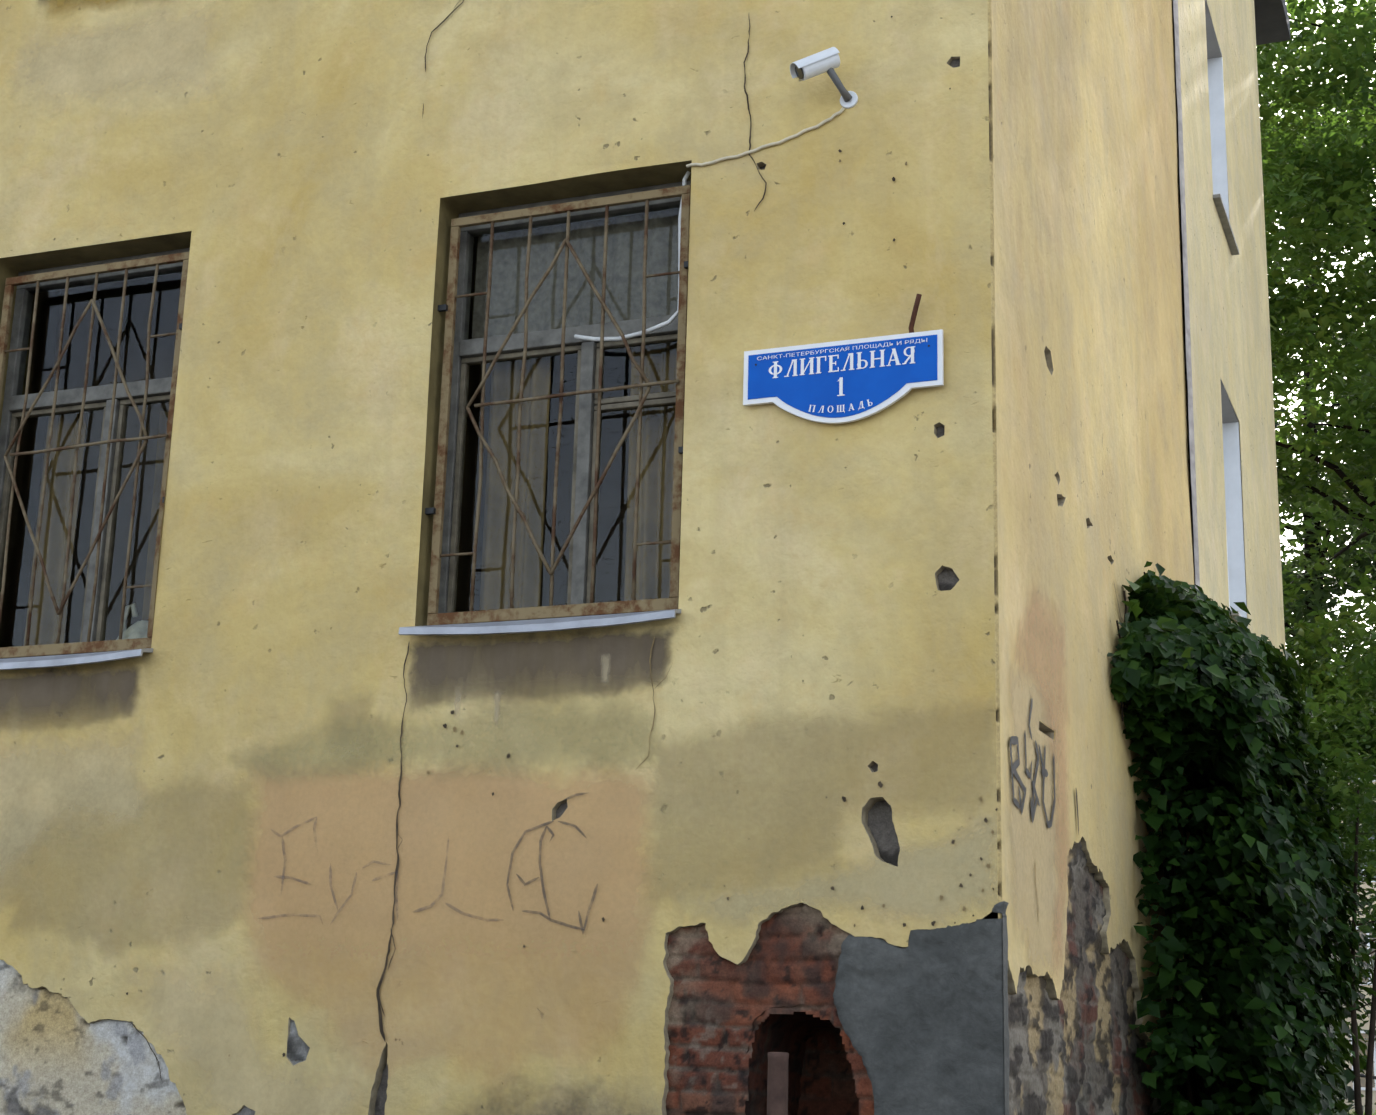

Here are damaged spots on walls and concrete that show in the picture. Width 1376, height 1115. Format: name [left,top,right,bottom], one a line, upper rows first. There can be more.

crack [422,0,464,118]
crack [743,19,767,211]
spalling [935,565,959,591]
damp [0,667,137,718]
spalling [861,761,900,867]
crack [368,644,409,1115]
spalling [0,960,187,1115]
spalling [282,1017,310,1066]
spalling [661,903,874,1115]
spalling [1008,836,1195,1115]
spalling [232,1105,256,1115]